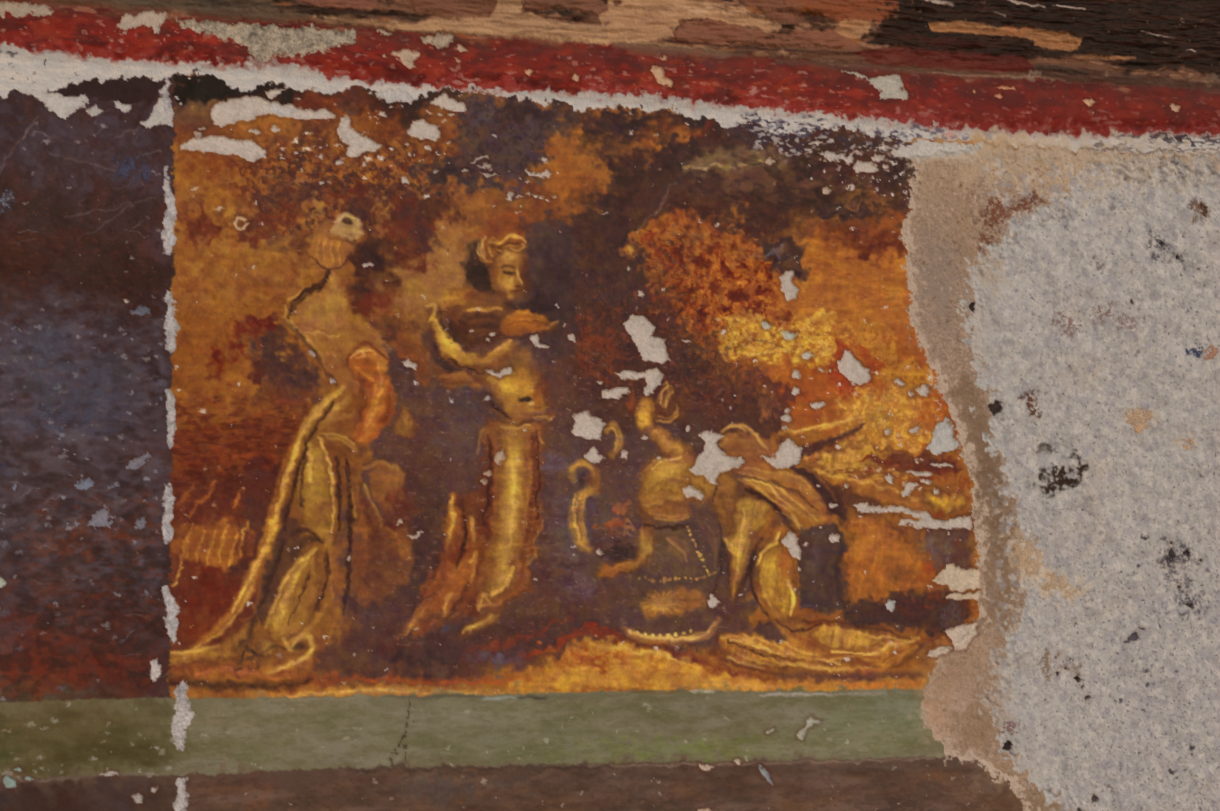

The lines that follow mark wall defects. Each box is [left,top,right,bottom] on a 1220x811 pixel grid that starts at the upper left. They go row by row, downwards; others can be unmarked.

peeling [0,15,1220,159]
peeling [178,125,267,163]
peeling [159,163,179,256]
peeling [121,288,183,358]
peeling [596,312,692,400]
peeling [86,481,177,546]
peeling [163,387,179,450]
peeling [570,408,629,465]
peeling [680,320,873,503]
spalling [852,140,1220,811]
peeling [160,583,181,645]
peeling [170,675,196,753]